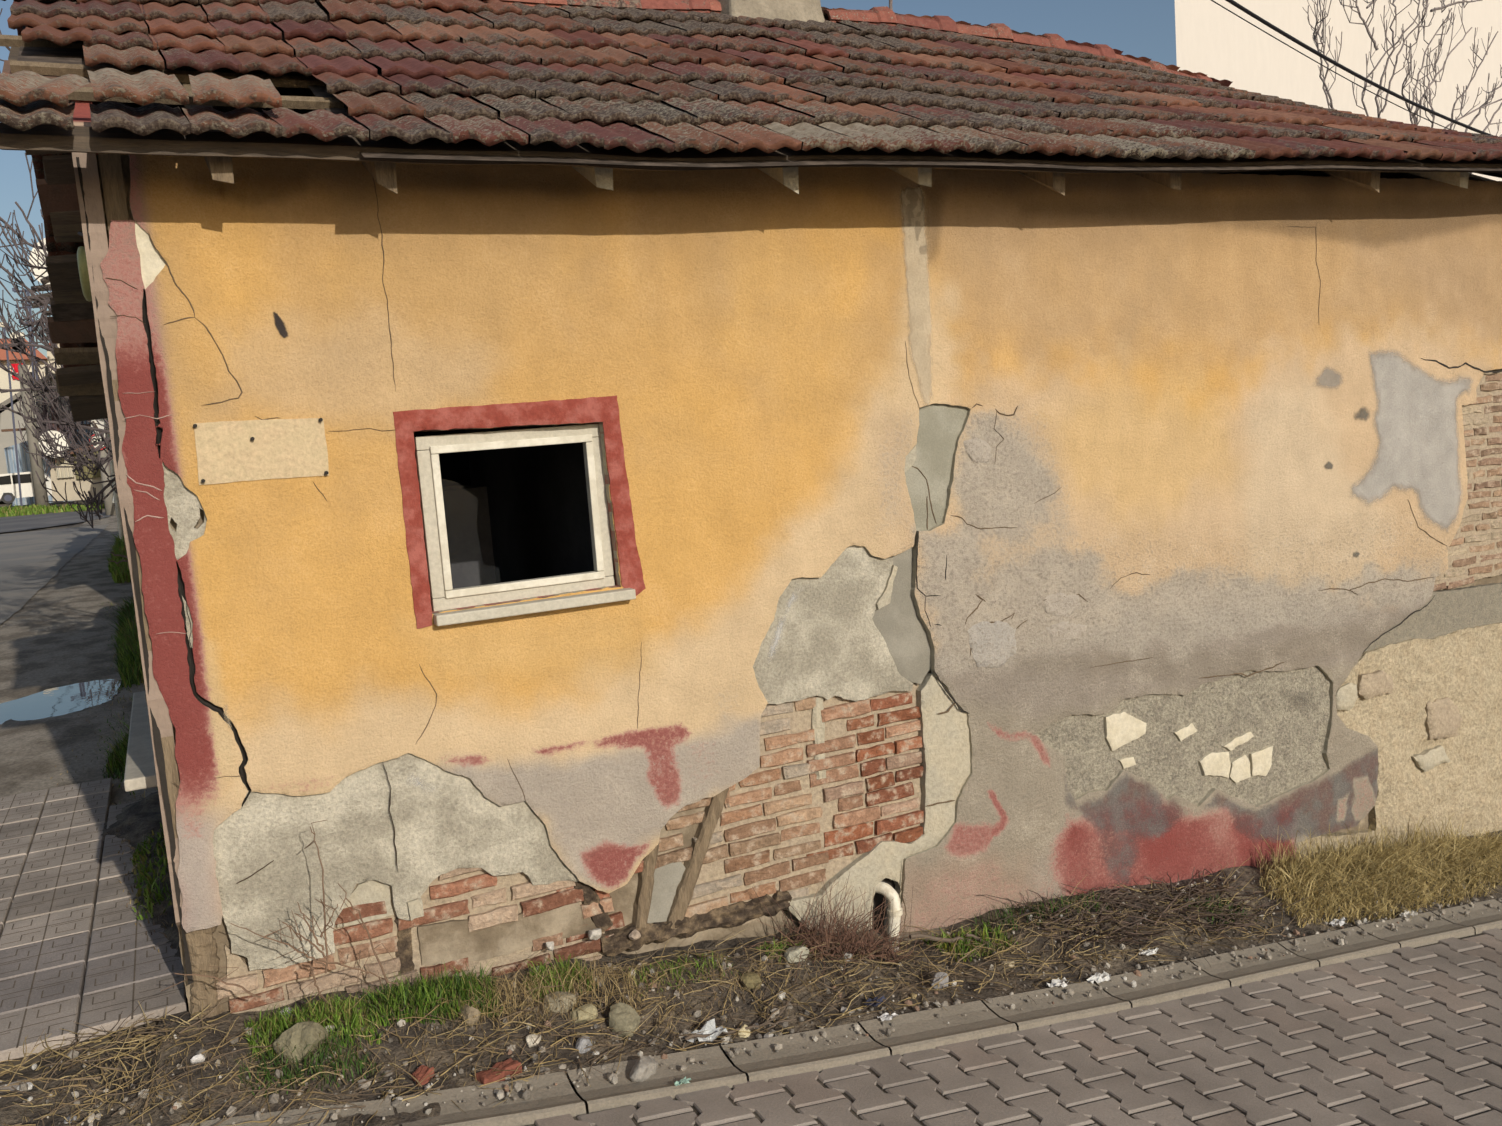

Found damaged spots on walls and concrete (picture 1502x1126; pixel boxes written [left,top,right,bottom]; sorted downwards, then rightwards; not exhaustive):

crack [76,157,278,985]
spalling [162,463,207,560]
spalling [753,403,971,934]
spalling [1035,666,1330,806]
peeling [1353,352,1471,528]
spalling [1364,582,1502,652]
spalling [213,753,579,971]